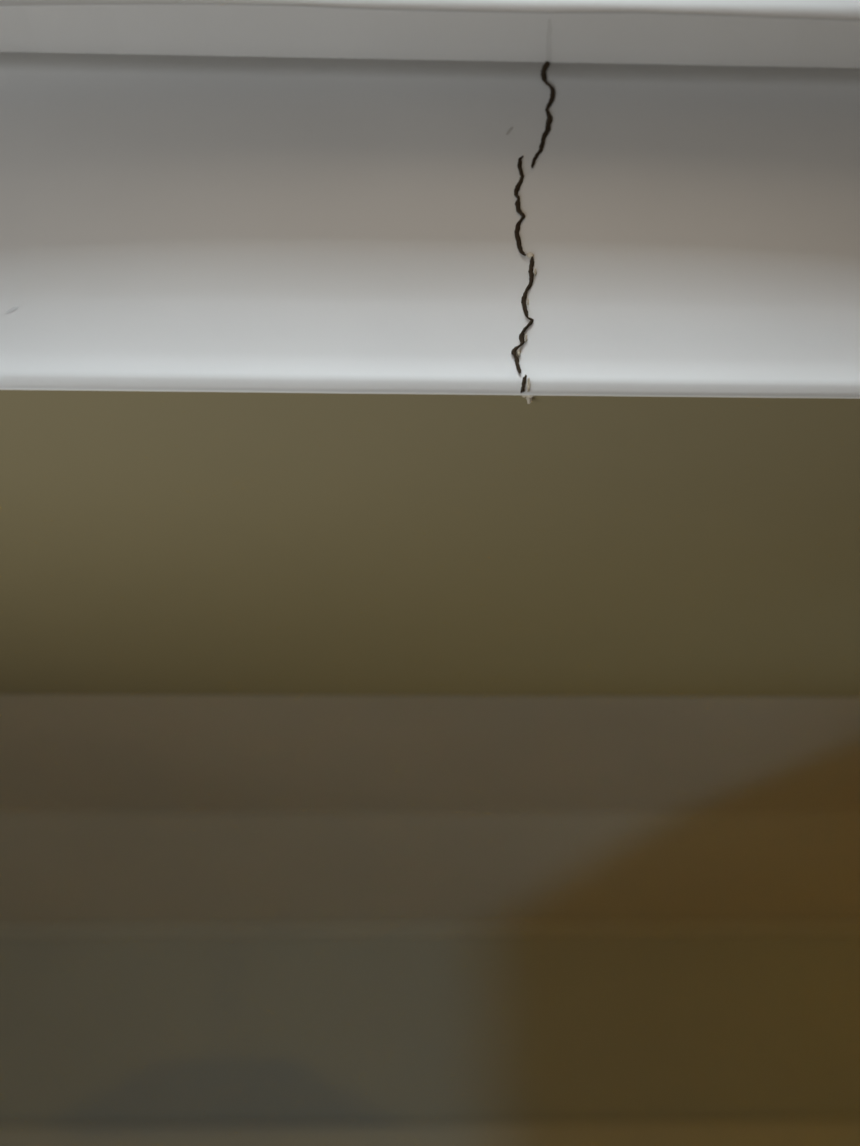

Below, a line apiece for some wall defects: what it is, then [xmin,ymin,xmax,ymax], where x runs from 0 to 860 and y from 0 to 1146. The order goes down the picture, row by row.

crack [506,61,555,393]